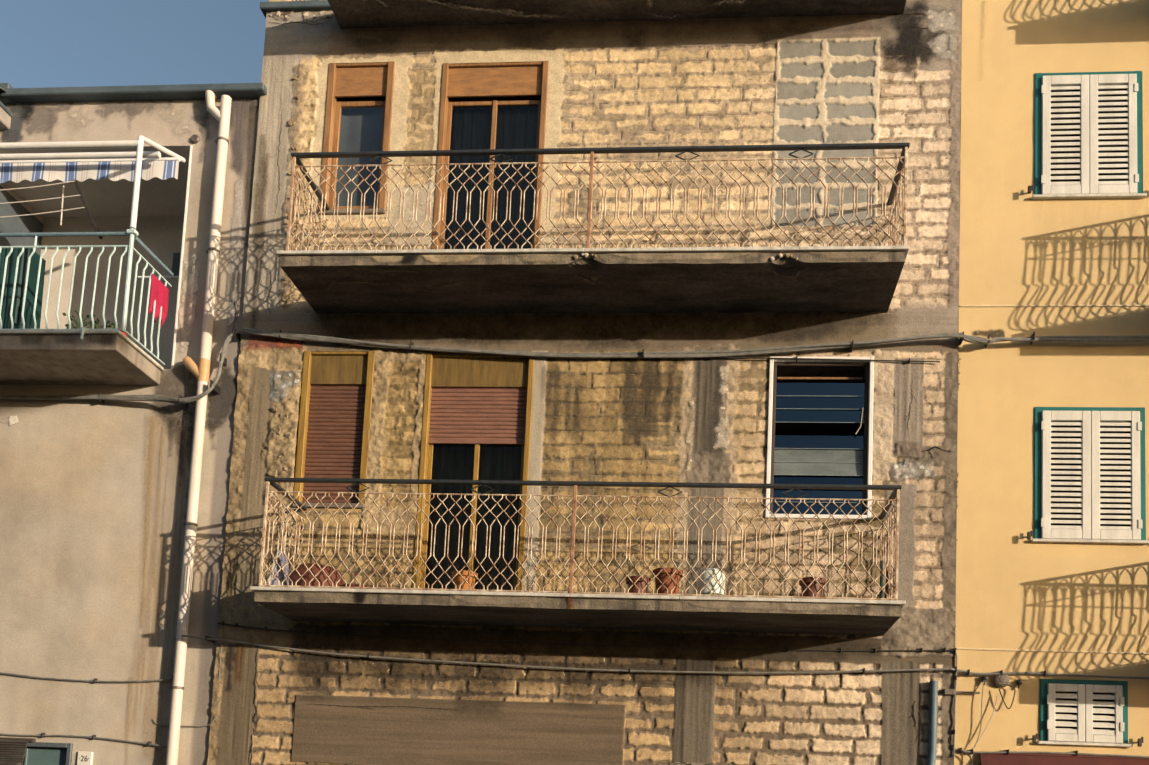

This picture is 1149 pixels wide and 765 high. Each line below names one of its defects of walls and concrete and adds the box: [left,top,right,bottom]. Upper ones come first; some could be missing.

leakage [882,2,944,74]
leakage [155,365,237,517]
leakage [622,358,677,441]